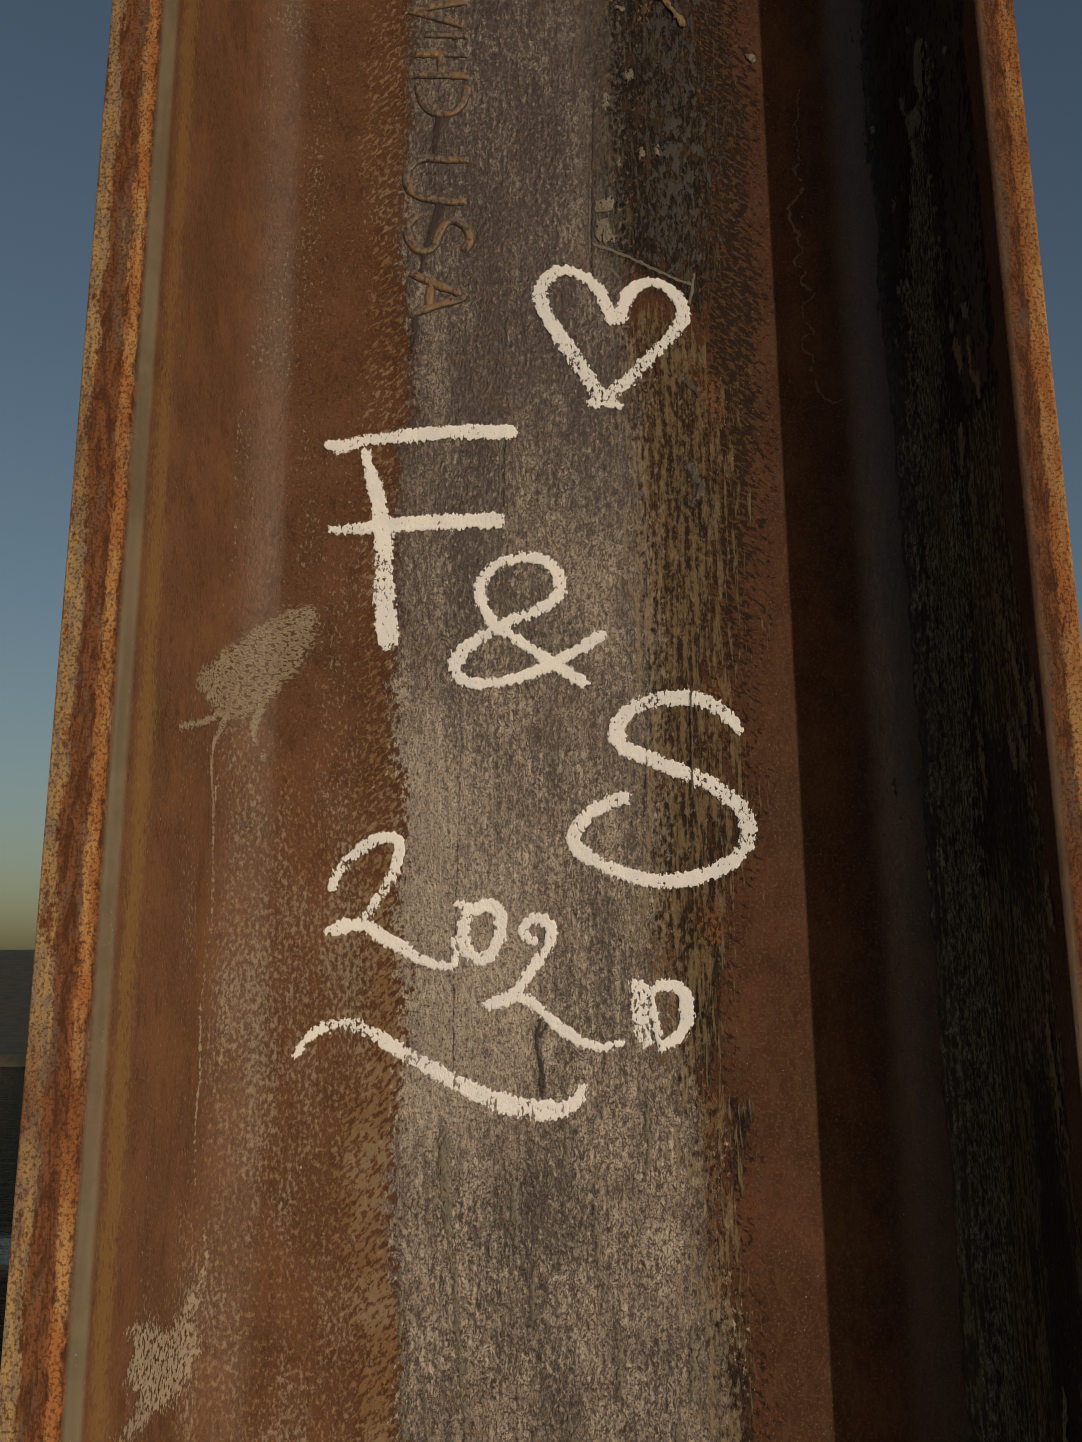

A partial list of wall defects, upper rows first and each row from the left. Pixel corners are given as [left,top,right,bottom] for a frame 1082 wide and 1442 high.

rust [952,331,981,400]
rust [992,576,1042,774]